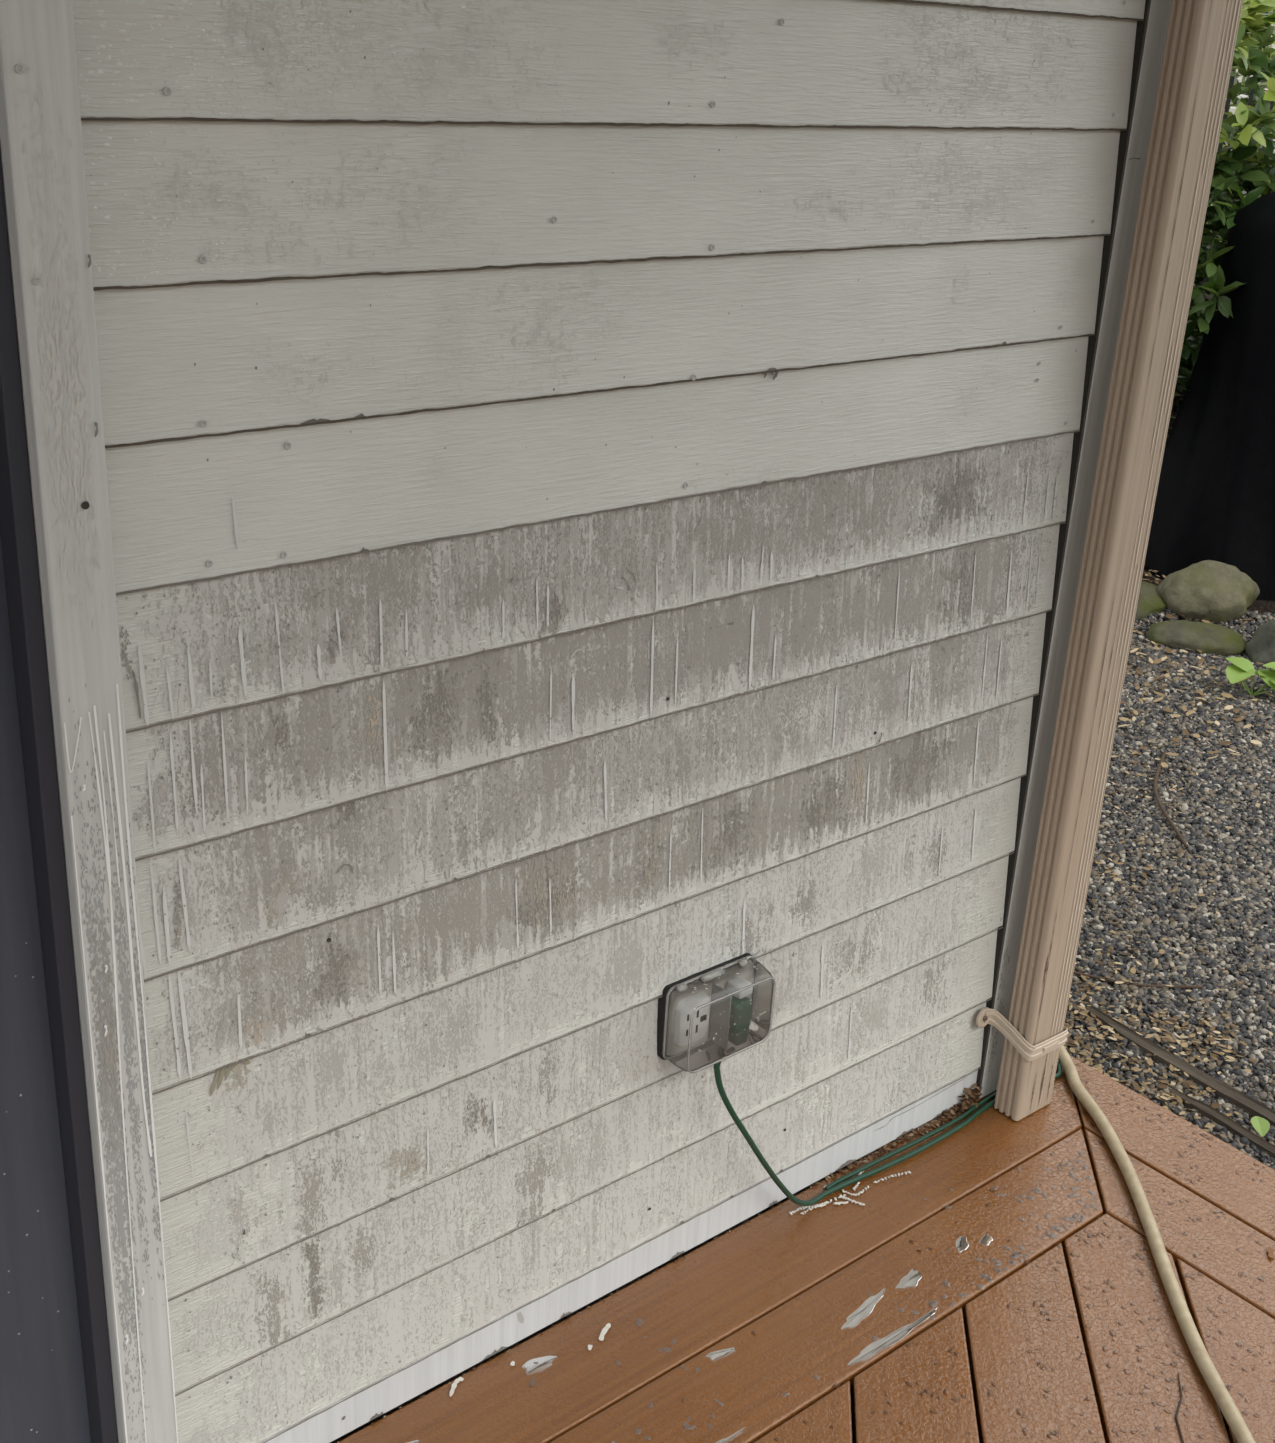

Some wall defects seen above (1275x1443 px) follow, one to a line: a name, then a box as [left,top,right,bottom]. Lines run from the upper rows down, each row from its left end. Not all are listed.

damp [13,55,128,646]
damp [64,382,1096,1443]